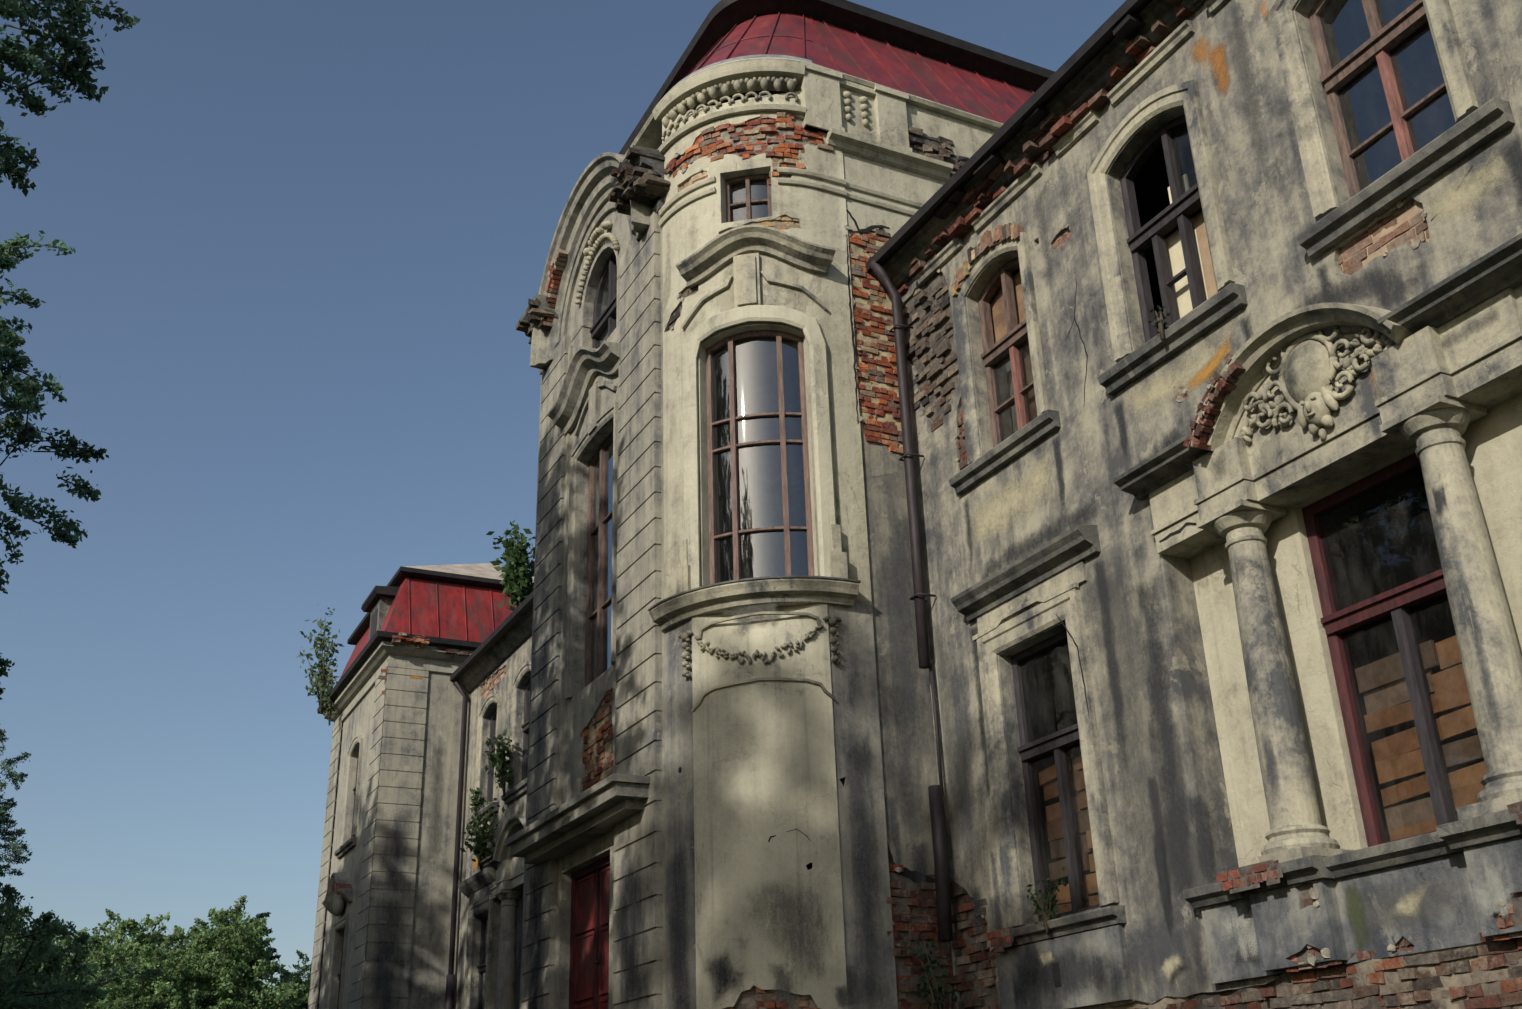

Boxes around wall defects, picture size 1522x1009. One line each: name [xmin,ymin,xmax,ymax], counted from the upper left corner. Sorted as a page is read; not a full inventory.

flaking render [665,112,833,191]
flaking render [908,126,969,177]
flaking render [1338,160,1502,275]
flaking render [844,225,968,471]
flaking render [579,689,614,791]
damp [1093,562,1211,977]
damp [376,815,415,1009]
flaking render [726,986,819,1009]
flaking render [886,864,1015,1009]
flaking render [1216,859,1283,894]
flaking render [1286,945,1342,972]
flaking render [1492,892,1522,941]